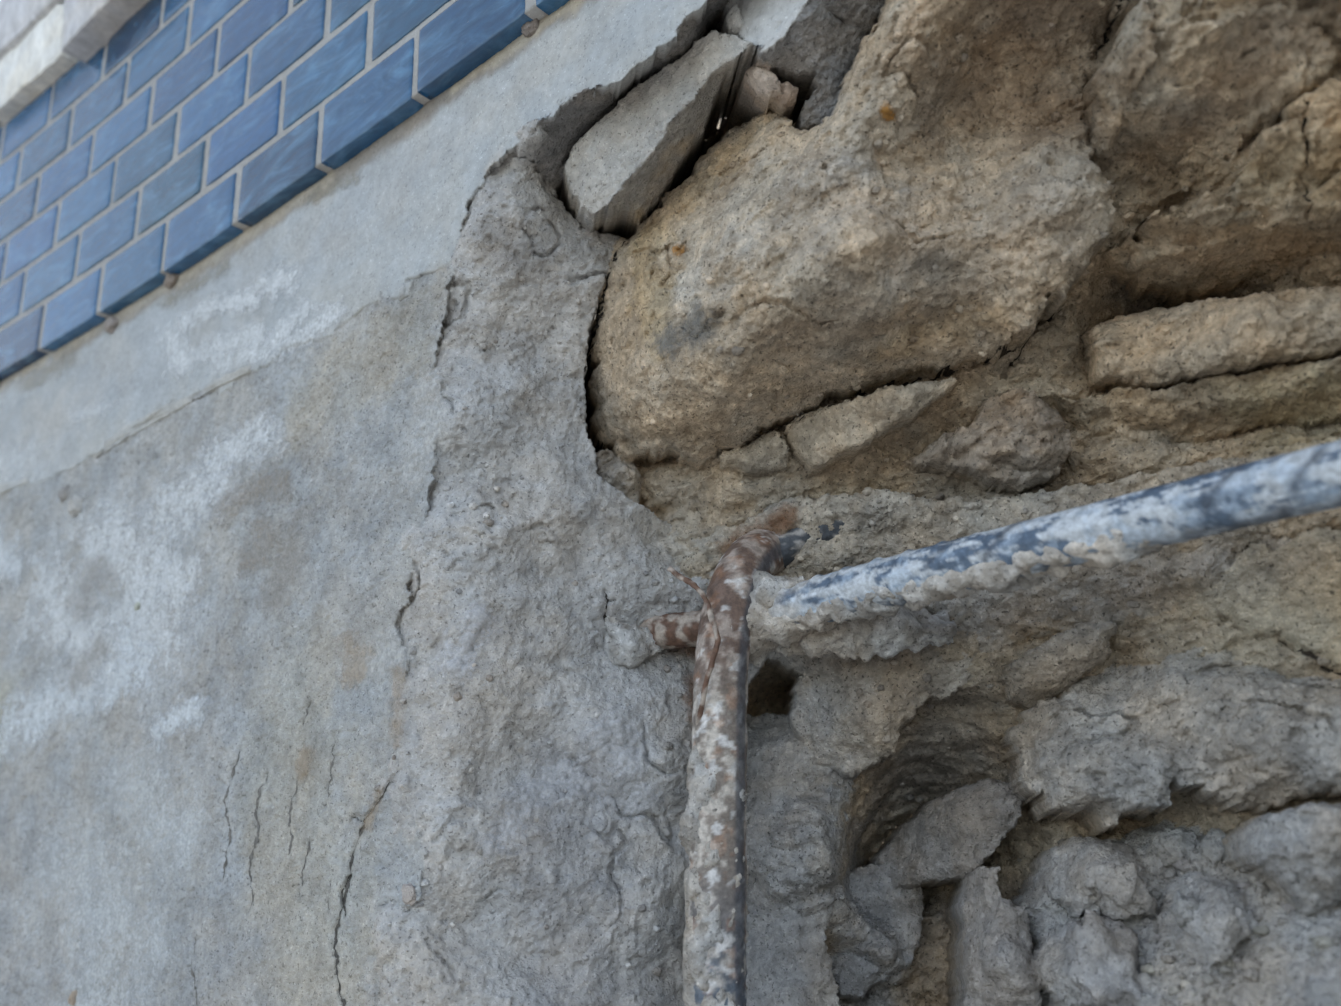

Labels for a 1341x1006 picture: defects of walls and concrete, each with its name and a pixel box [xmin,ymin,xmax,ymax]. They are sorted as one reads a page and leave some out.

crack [1095,0,1130,59]
crack [1300,98,1313,217]
spalling [357,0,1341,1006]
crack [1280,641,1341,676]